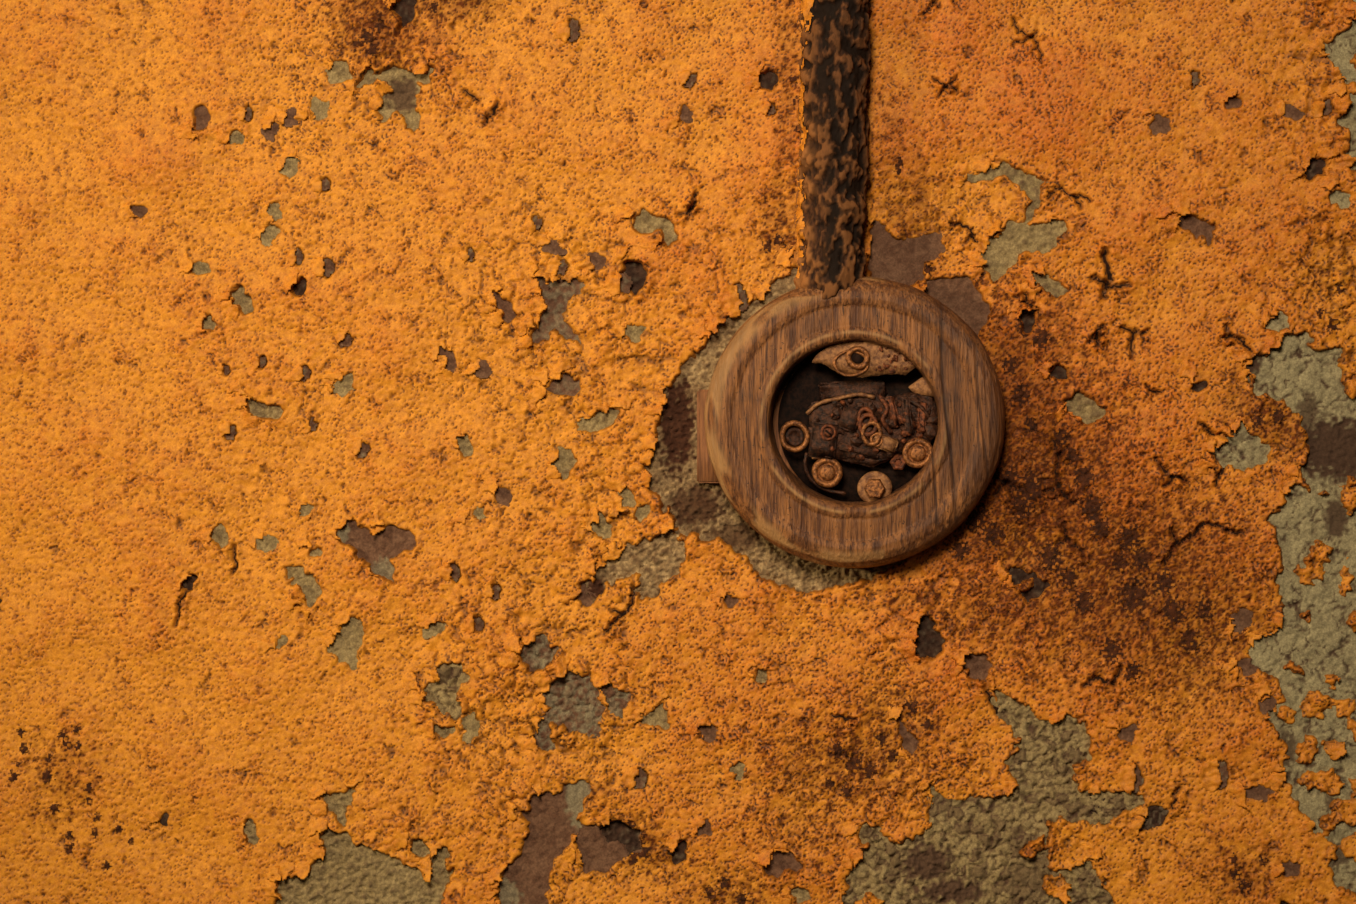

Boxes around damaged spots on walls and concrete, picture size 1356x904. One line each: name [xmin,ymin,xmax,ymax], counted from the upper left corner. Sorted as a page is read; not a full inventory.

peeling [325,50,436,131]
peeling [1285,0,1356,209]
peeling [478,206,677,349]
peeling [864,154,1068,336]
flaking render [561,245,904,608]
peeling [247,501,364,670]
peeling [329,505,416,582]
peeling [1213,306,1356,893]
peeling [263,767,453,904]
peeling [481,770,642,904]
peeling [499,629,670,753]
peeling [837,611,1169,904]